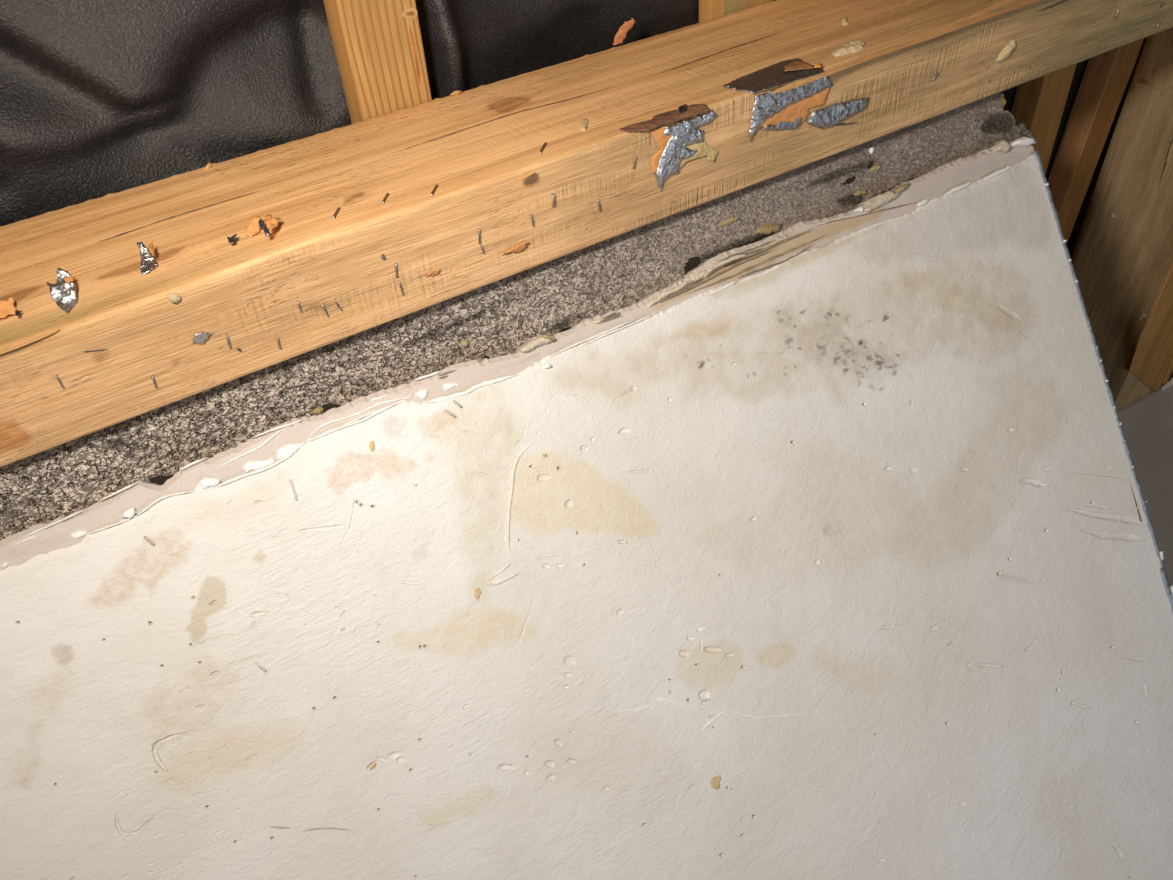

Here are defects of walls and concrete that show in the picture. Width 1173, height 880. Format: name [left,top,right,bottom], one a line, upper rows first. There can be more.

peeling [854,183,910,213]
peeling [944,137,1036,195]
peeling [519,235,791,369]
peeling [71,371,519,539]
water stain [376,152,1075,667]
peeling [13,509,87,546]
peeling [78,526,197,617]
water stain [125,573,328,810]
water stain [669,634,909,707]
water stain [410,689,711,847]